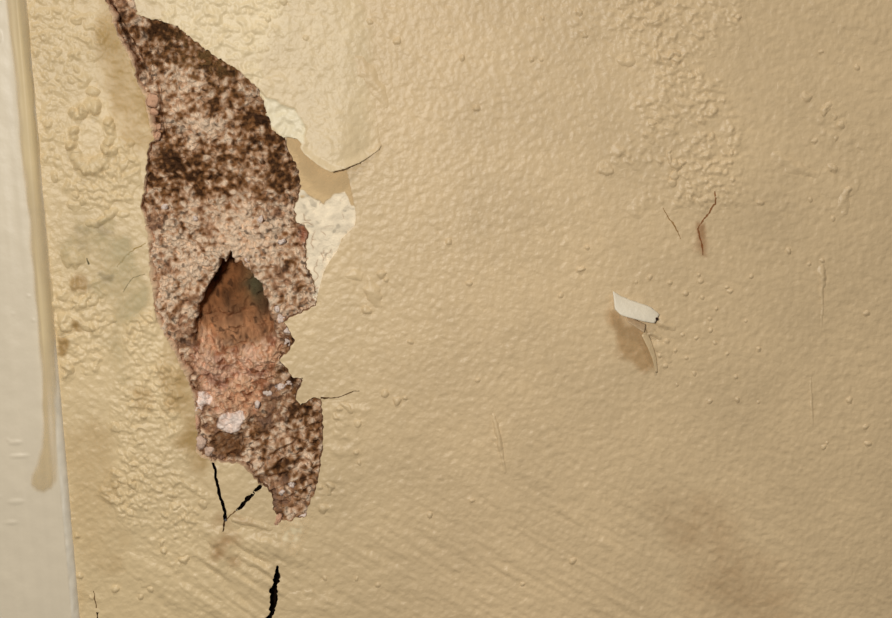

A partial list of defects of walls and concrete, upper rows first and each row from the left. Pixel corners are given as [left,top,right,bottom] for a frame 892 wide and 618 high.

spalling [105,0,381,526]
peeling [613,291,685,375]
crack [212,463,262,532]
crack [266,565,281,618]